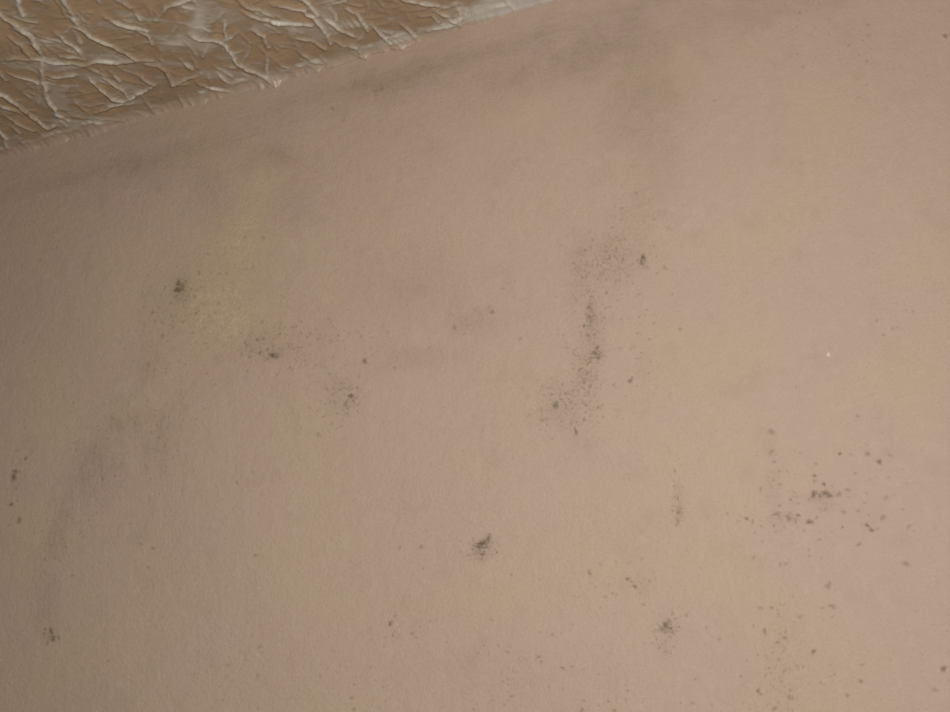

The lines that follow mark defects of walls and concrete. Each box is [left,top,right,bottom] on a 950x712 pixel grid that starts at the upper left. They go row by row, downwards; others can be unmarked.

damp [0,0,474,144]